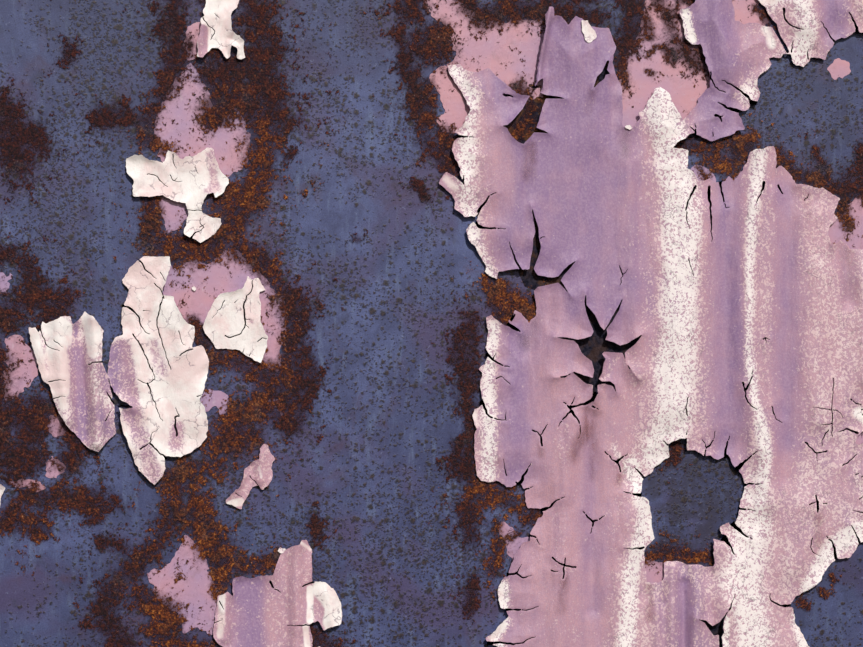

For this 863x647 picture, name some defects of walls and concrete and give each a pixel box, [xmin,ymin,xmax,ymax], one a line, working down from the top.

corrosion [360,0,710,218]
peeling [655,0,863,267]
peeling [0,0,268,647]
corrosion [0,0,347,647]
corrosion [310,621,371,647]
peeling [213,0,553,647]
corrosion [426,261,543,625]
crack [475,192,641,446]
peeling [630,426,760,595]
crack [699,595,735,647]
crack [721,507,755,555]
crack [805,378,863,544]